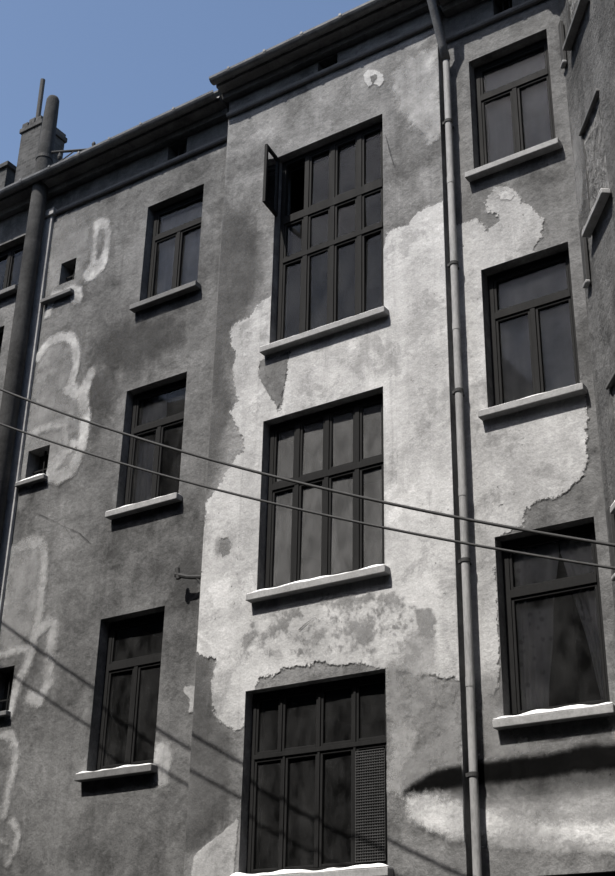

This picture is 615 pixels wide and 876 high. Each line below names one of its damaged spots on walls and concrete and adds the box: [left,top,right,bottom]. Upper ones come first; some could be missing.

flaking render [363,48,441,144]
flaking render [197,201,459,732]
flaking render [456,186,589,694]
water stain [242,610,303,654]
flaking render [183,685,195,713]
water stain [298,592,461,800]
water stain [475,682,615,761]
flaking render [152,741,172,786]
flaking render [191,819,239,876]